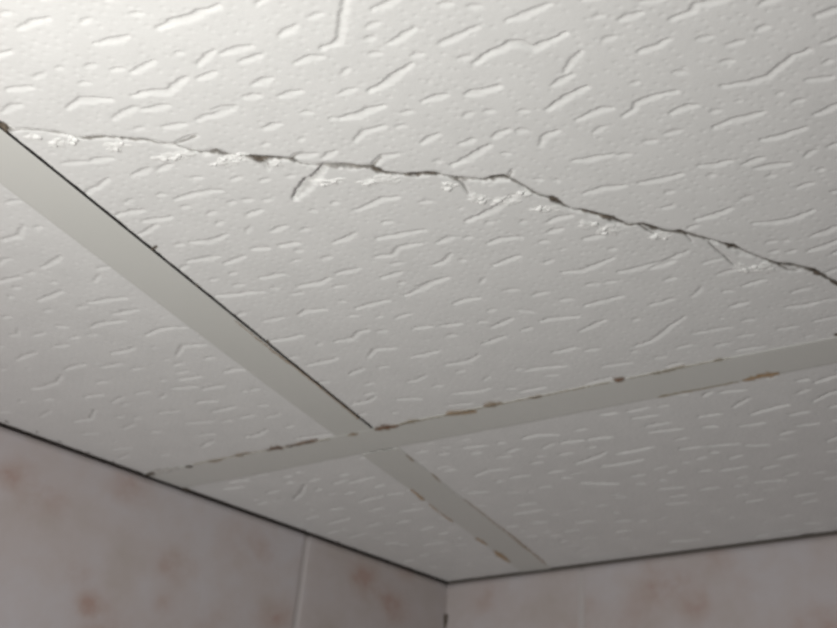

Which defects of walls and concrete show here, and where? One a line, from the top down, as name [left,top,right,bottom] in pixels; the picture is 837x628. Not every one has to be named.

crack [0,122,9,132]
crack [81,133,142,141]
crack [247,154,295,162]
crack [337,163,457,178]
crack [485,174,837,285]
corrosion [660,372,779,397]